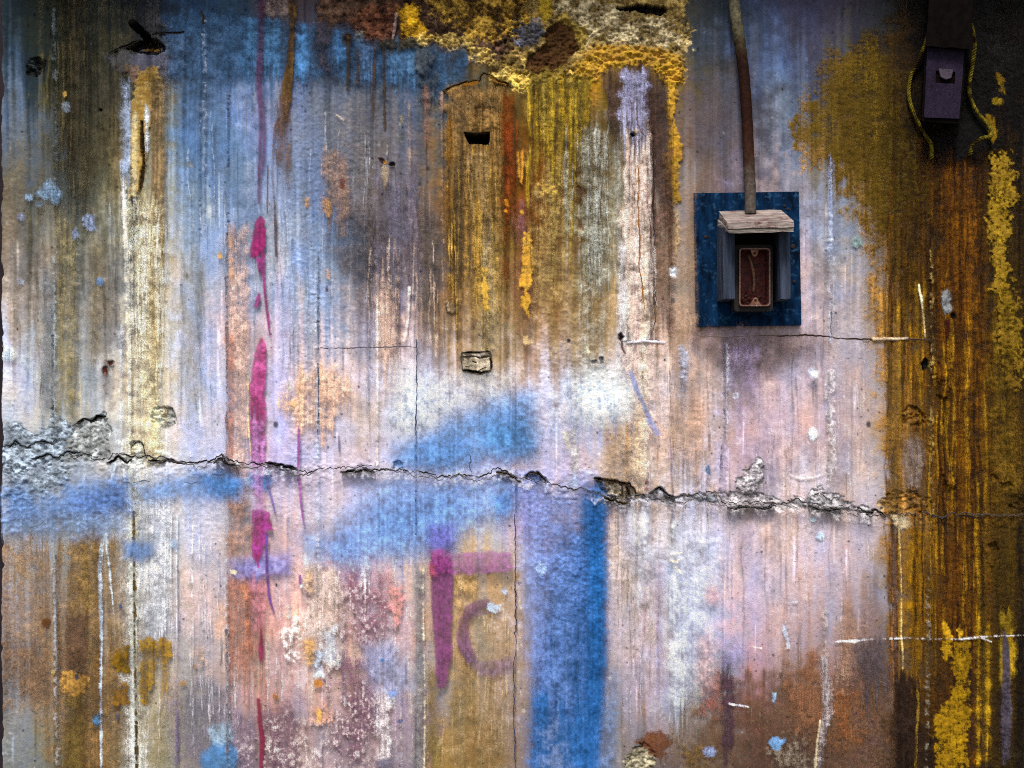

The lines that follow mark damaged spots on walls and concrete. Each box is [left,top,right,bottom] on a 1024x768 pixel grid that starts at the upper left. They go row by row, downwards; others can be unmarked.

spalling [262,0,290,19]
spalling [312,0,694,93]
corrosion [440,83,535,397]
crack [695,311,935,341]
corrosion [672,0,1024,768]
spalling [1,407,112,501]
spalling [322,460,416,479]
spalling [432,469,578,496]
crack [4,415,1024,519]
spalling [591,457,926,524]